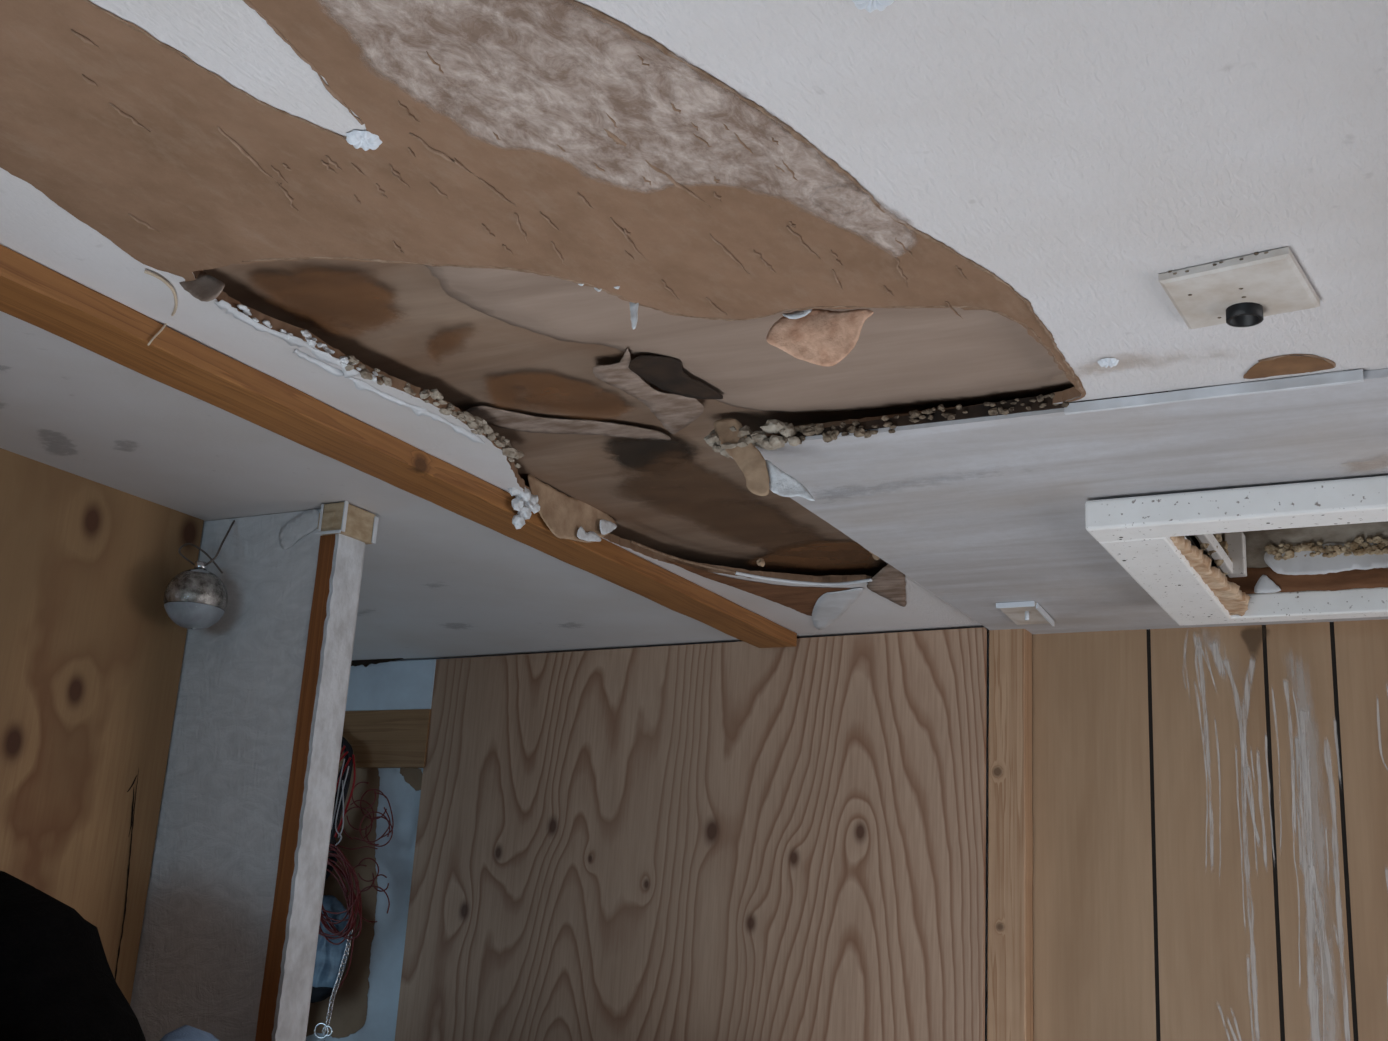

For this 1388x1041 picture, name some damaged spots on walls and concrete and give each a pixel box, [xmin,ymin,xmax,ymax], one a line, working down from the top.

peeling [0,0,1086,416]
spalling [237,304,525,468]
spalling [704,404,968,458]
peeling [1243,354,1336,379]
leakage [1377,688,1388,768]
leakage [1194,637,1350,1041]